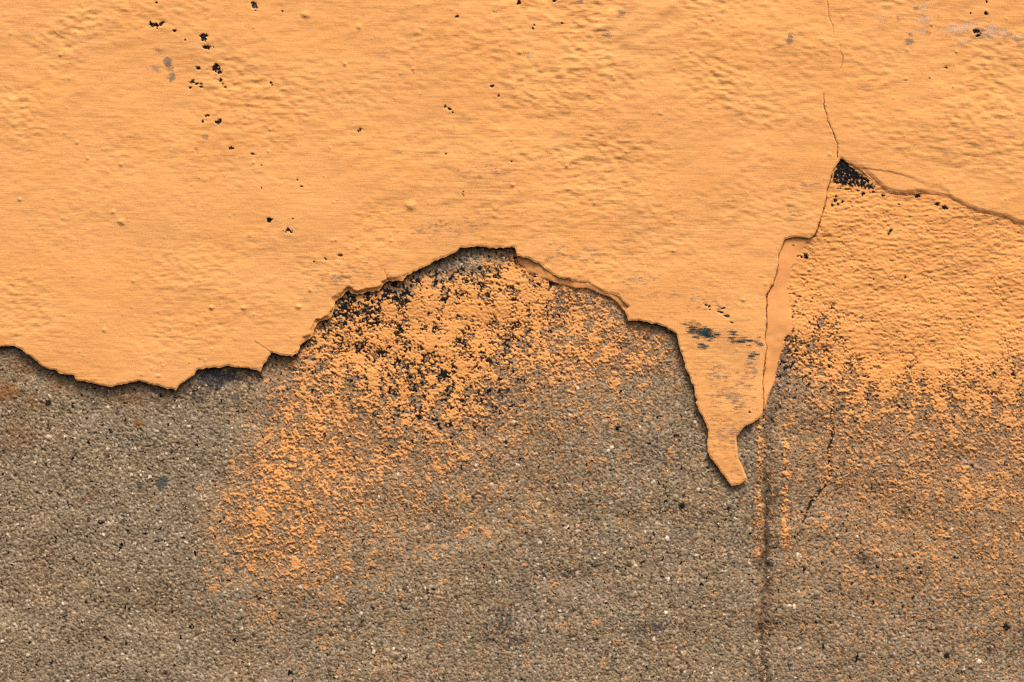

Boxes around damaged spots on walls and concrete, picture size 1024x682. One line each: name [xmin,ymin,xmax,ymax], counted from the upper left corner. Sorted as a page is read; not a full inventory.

peeling [0,158,1024,682]
crack [762,97,838,409]